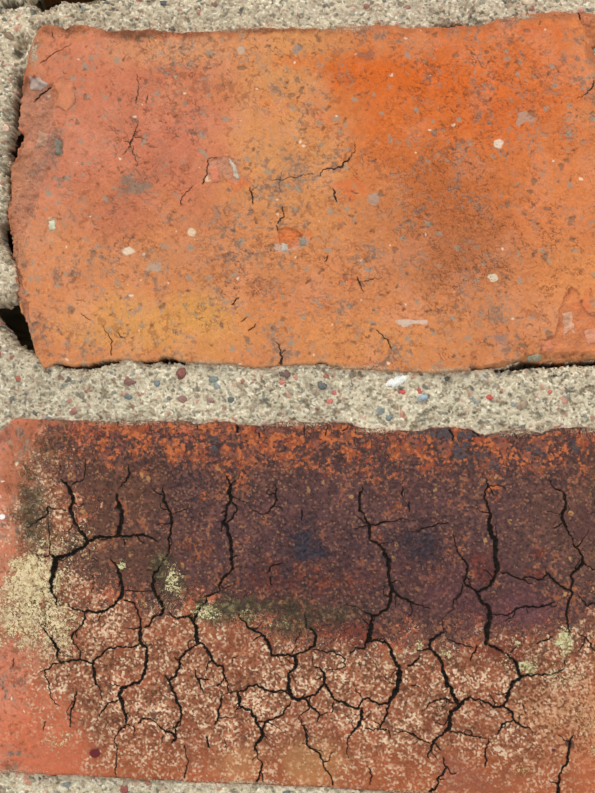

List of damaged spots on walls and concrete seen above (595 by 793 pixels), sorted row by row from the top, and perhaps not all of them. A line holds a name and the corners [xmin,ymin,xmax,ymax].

spalling [44,0,90,8]
spalling [206,156,242,184]
spalling [278,227,306,251]
spalling [469,287,595,371]
crack [27,460,595,793]